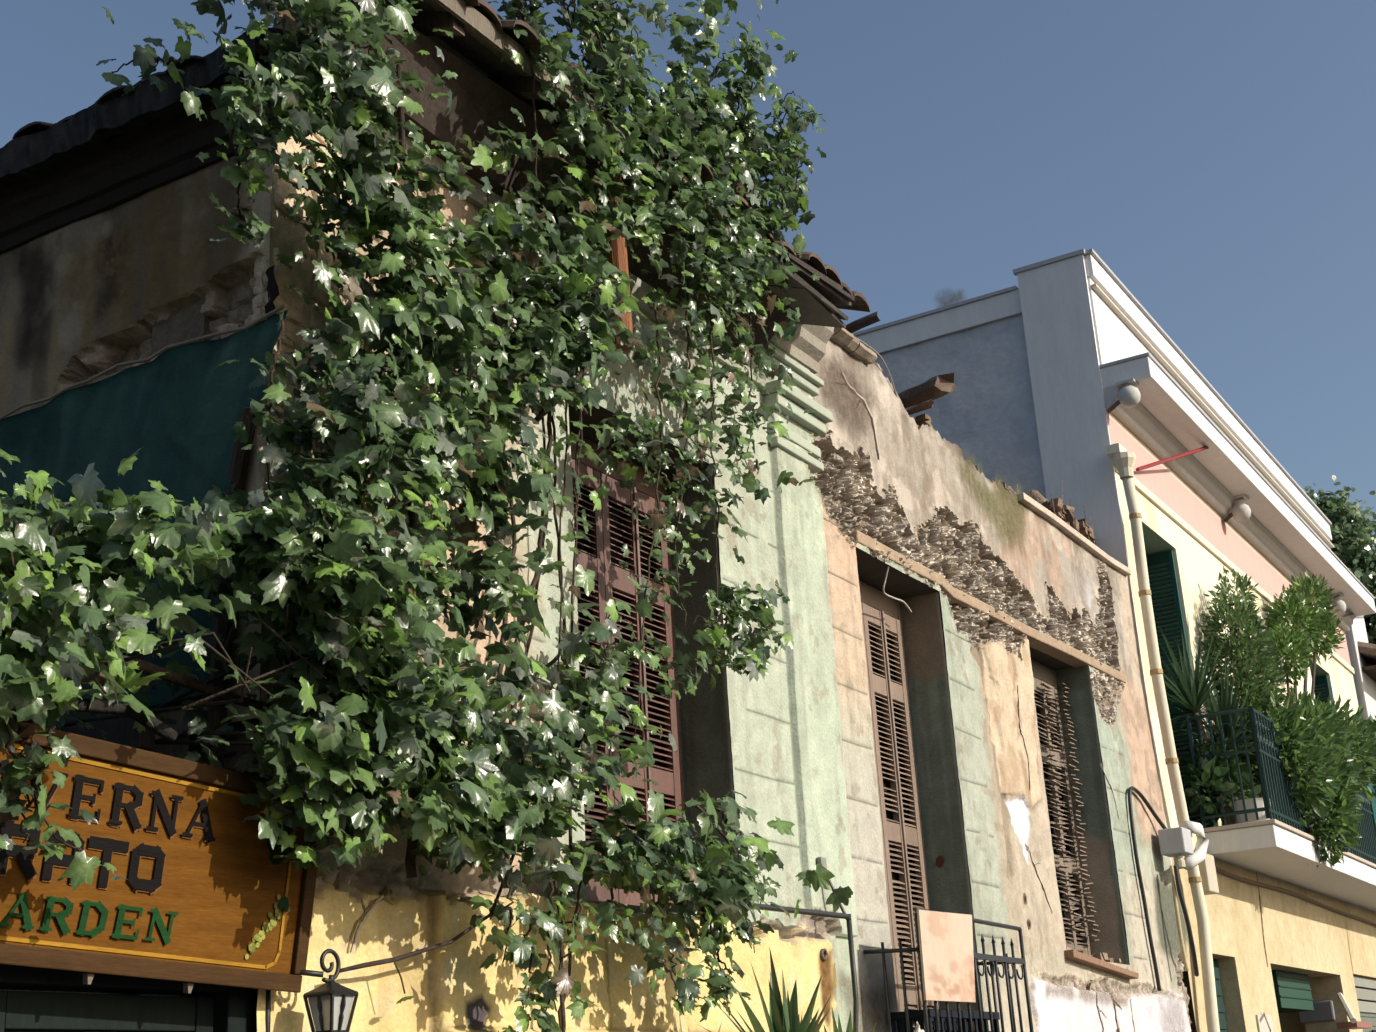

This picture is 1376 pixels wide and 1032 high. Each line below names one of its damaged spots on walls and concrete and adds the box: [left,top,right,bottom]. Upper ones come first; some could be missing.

leakage [18,251,44,363]
spalling [54,248,270,394]
spalling [808,429,1126,866]
crack [1017,685,1031,783]
crack [1025,842,1053,913]
crack [1088,983,1135,1032]
spalling [1033,951,1192,1032]